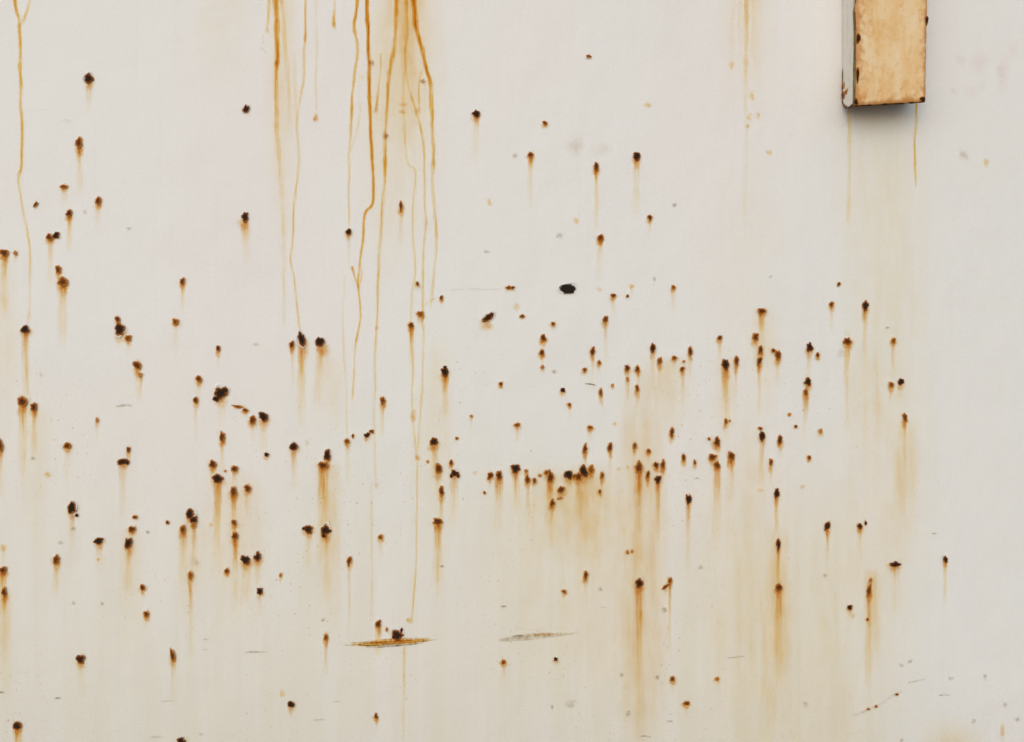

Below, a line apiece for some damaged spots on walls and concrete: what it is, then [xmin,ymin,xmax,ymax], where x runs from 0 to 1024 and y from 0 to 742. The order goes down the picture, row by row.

corrosion [841,67,925,108]
corrosion [55,265,68,288]
corrosion [657,346,693,371]
corrosion [752,333,781,366]
corrosion [17,396,37,412]
corrosion [426,459,453,497]
corrosion [524,443,604,507]
corrosion [632,443,665,479]
corrosion [708,436,735,469]